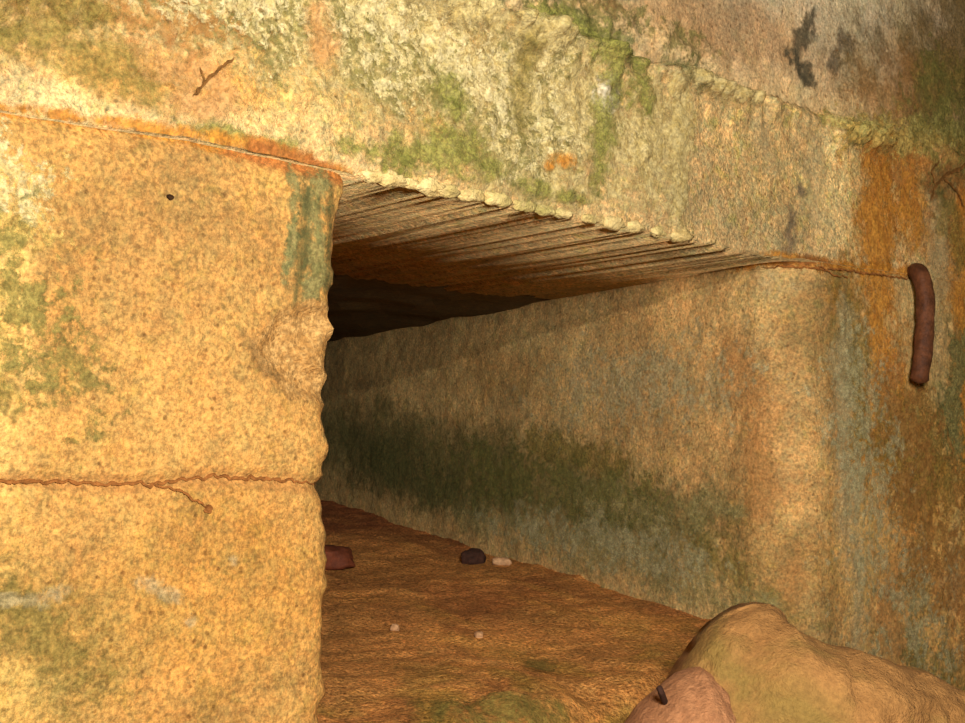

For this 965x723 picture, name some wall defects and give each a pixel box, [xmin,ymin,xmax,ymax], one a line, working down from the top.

water stain [785,7,816,87]
water stain [828,32,854,73]
water stain [896,0,965,146]
water stain [82,0,696,231]
crack [761,265,908,280]
rust [737,107,965,532]
crack [0,473,316,507]